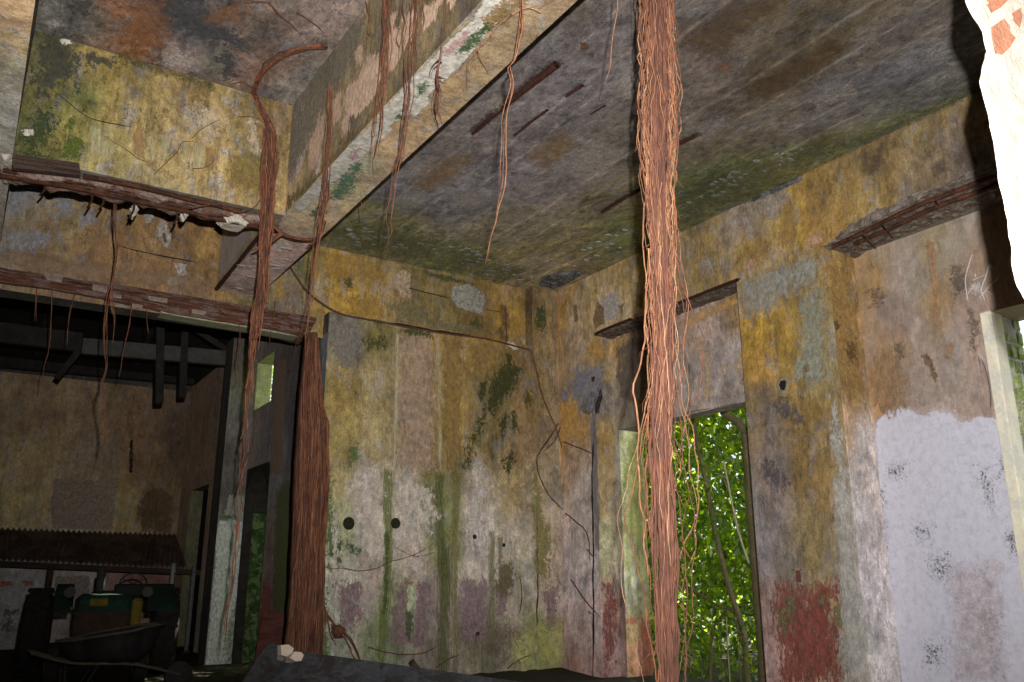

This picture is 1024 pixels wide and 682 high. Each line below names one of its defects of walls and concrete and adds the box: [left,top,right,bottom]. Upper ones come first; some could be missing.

spalling [0,153,294,291]
water stain [321,249,521,470]
spalling [594,293,651,339]
spalling [673,159,1001,395]